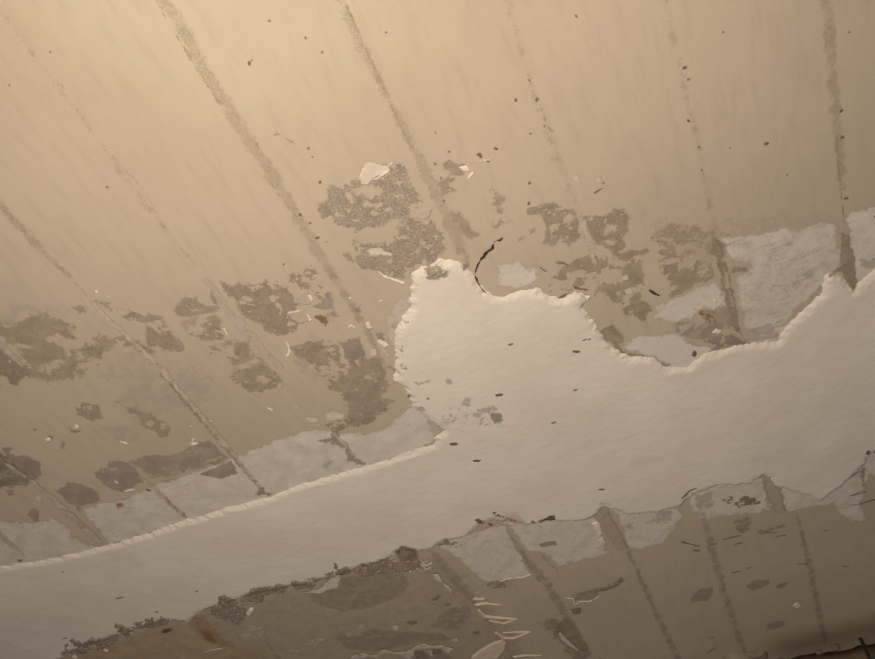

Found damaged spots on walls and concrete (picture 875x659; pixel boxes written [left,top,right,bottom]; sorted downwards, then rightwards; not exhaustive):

peeling [437,153,490,195]
peeling [317,161,446,285]
crack [475,237,503,295]
peeling [518,176,731,322]
peeling [0,265,395,465]
peeling [600,324,671,367]
peeling [676,298,745,352]
peeling [0,447,43,496]
peeling [57,425,237,512]
spalling [207,548,472,652]
spalling [61,612,169,659]